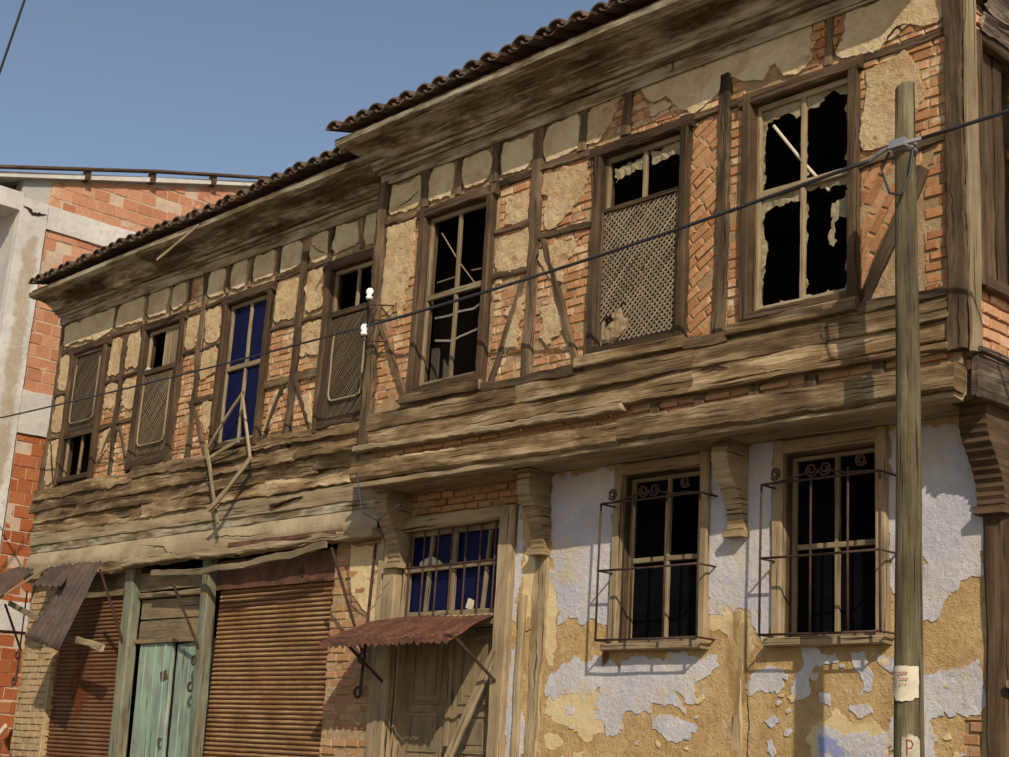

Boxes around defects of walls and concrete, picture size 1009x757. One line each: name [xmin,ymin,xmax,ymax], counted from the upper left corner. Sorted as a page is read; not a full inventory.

damp [663,0,737,38]
spalling [813,12,847,60]
peeling [543,466,719,757]
crack [742,611,750,757]
peeling [708,442,894,757]
peeling [888,429,896,594]
peeling [921,423,984,622]
peeling [924,659,986,757]